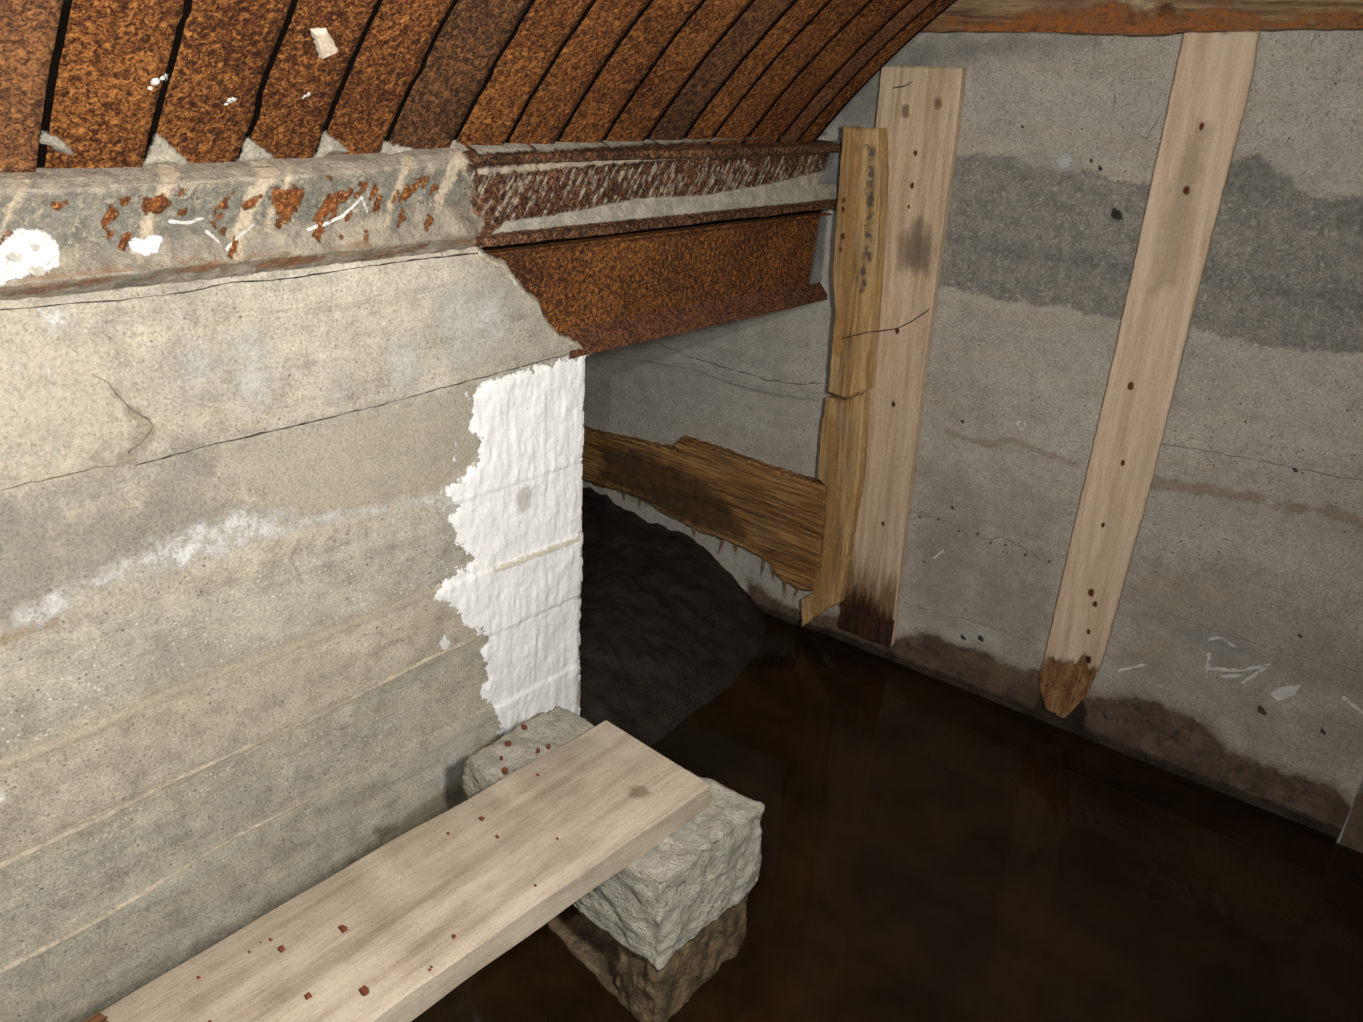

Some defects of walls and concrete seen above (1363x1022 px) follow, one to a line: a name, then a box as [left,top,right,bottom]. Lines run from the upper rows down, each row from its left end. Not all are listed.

rust [0,266,131,295]
rust [101,189,187,251]
crack [0,252,485,310]
rust [150,175,473,278]
leakage [0,149,675,288]
leakage [939,153,1151,318]
leakage [1191,155,1363,353]
leakage [0,391,477,645]
crack [0,353,570,491]
peeling [416,247,592,736]
leakage [749,418,1363,853]